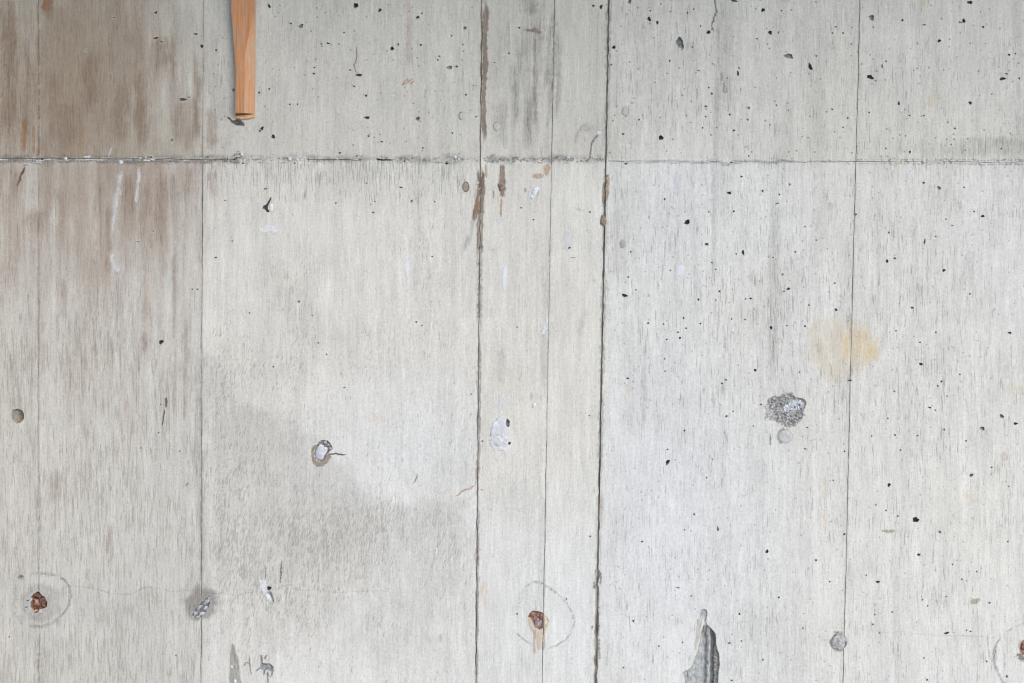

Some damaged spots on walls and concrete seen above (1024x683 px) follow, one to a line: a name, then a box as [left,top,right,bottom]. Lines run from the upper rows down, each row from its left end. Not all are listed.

corrosion [473,173,487,249]
corrosion [498,165,506,197]
spalling [683,609,720,683]